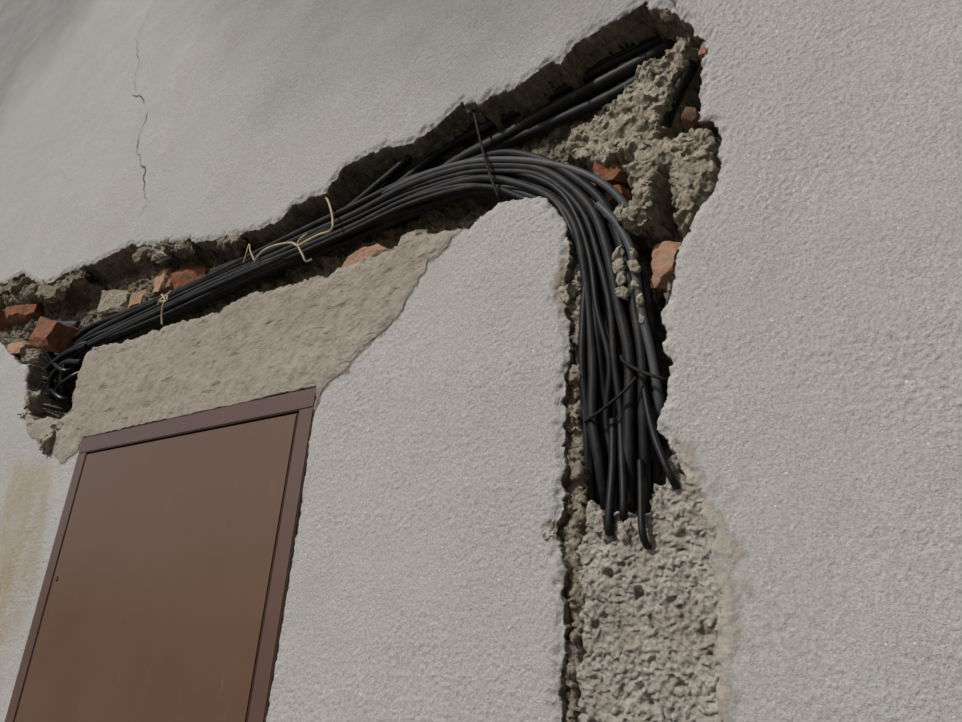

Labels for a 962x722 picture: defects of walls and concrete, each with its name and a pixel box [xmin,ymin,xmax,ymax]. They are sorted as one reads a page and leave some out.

crack [132,16,148,210]
flaking render [0,10,722,464]
flaking render [541,364,648,722]